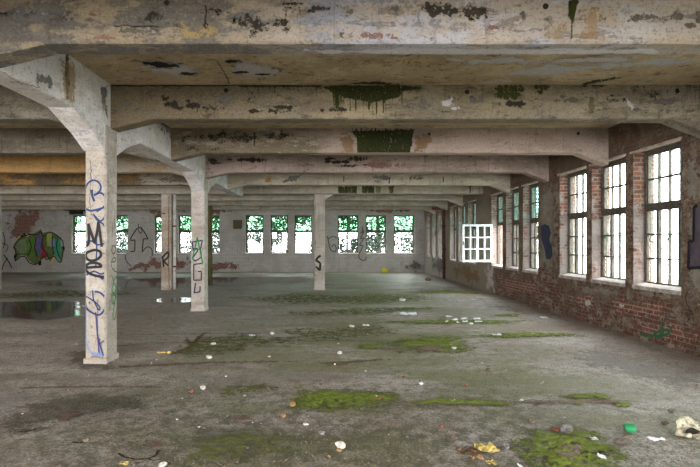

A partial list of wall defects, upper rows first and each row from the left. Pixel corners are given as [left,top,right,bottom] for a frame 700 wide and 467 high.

peeling [299,4,700,76]
peeling [133,60,202,78]
peeling [36,73,53,90]
mould [498,99,526,108]
flaking render [6,210,40,238]
flaking render [128,256,161,272]
flaking render [212,262,239,271]
flaking render [684,253,700,305]
flaking render [560,285,698,350]